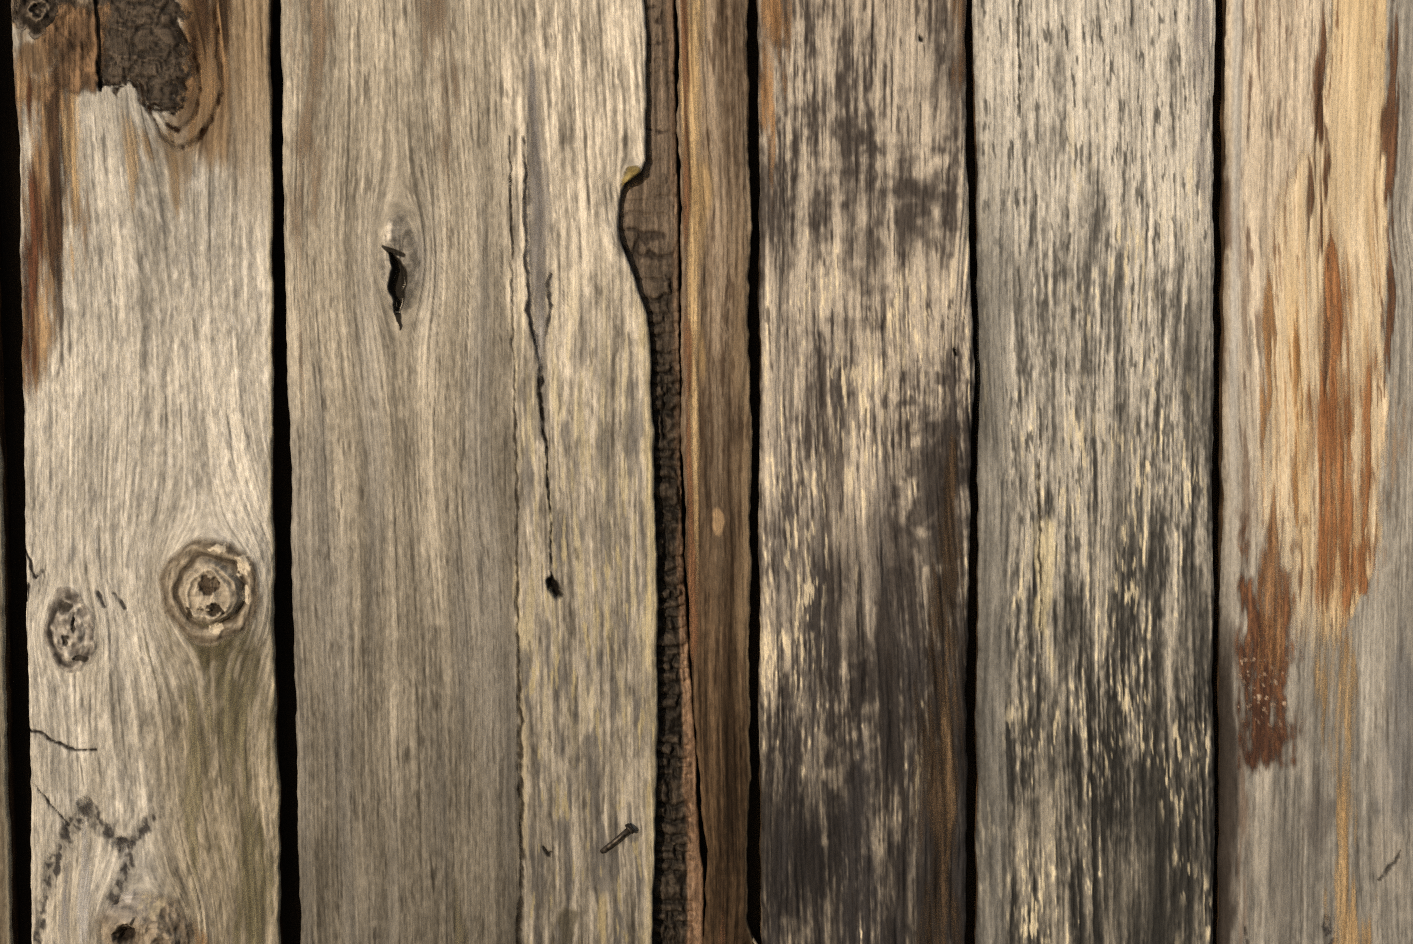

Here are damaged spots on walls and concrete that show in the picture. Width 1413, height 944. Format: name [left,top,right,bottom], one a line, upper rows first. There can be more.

crack [508,136,562,944]